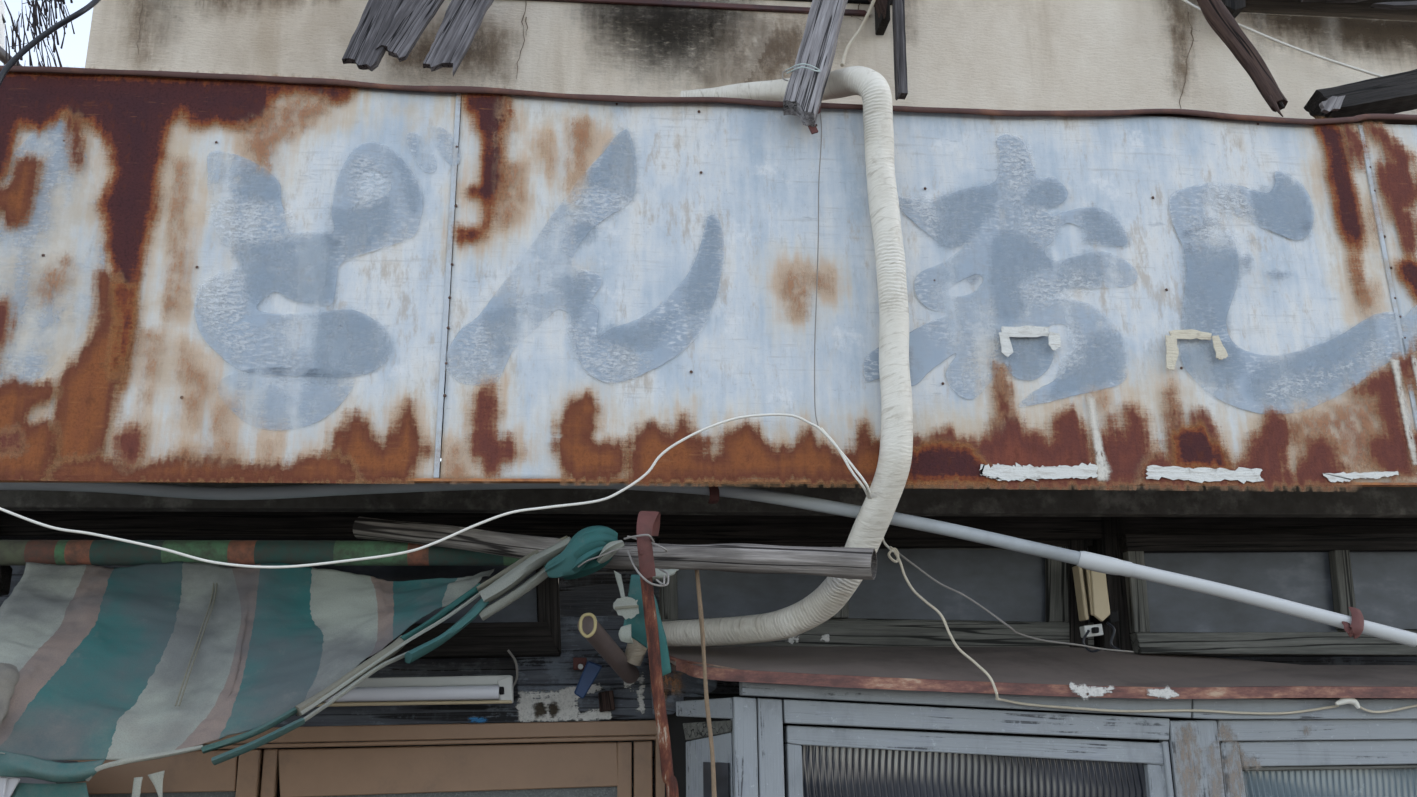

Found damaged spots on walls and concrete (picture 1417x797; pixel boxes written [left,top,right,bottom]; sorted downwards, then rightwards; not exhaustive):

damp [594,0,801,84]
crack [1179,12,1200,108]
corrosion [453,93,524,246]
corrosion [1314,120,1417,310]
corrosion [0,72,431,484]
corrosion [446,380,517,481]
corrosion [551,388,880,488]
corrosion [906,340,1417,492]
peeling [1069,682,1114,698]
peeling [1147,687,1179,699]